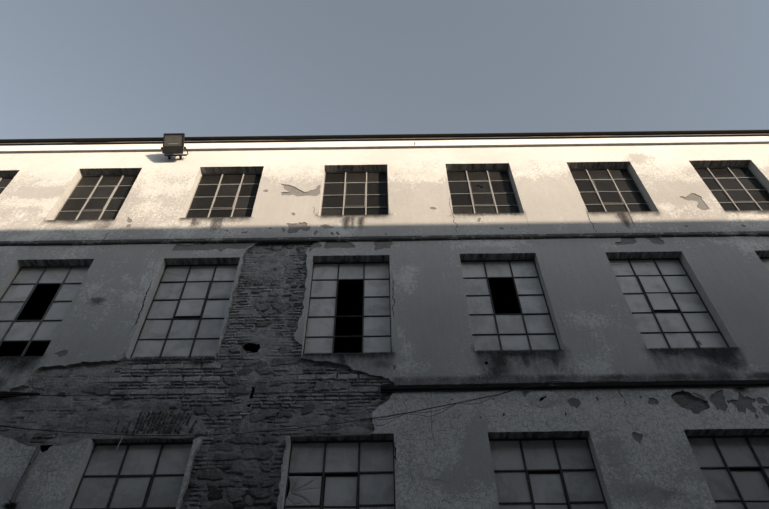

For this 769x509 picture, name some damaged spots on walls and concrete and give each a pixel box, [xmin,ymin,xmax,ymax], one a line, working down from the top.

flaking render [281,184,321,197]
flaking render [680,193,709,210]
crack [131,282,152,330]
flaking render [0,213,395,509]
water stain [395,349,573,382]
water stain [587,347,739,380]
flaking render [671,389,769,419]